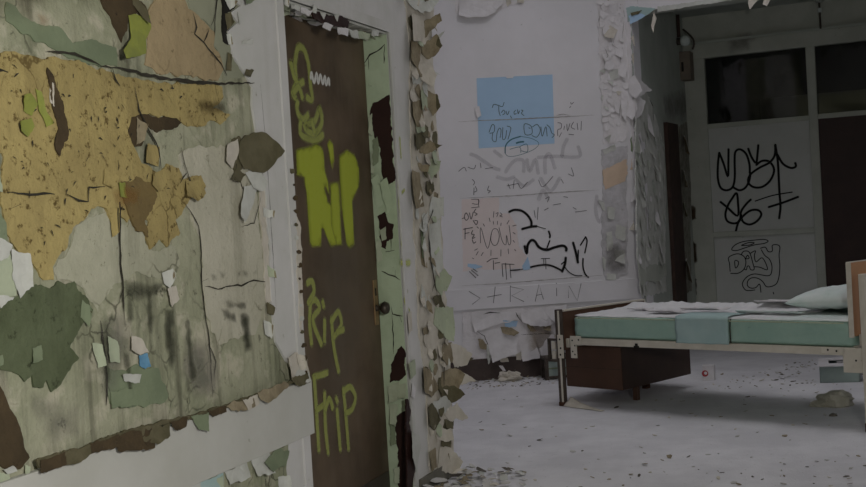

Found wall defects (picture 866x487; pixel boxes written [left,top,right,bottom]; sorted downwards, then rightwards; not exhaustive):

flaking render [0,0,285,392]
peeling [0,169,311,487]
crack [186,164,276,389]
peeling [284,0,384,41]
peeling [387,0,567,487]
peeling [596,0,731,298]